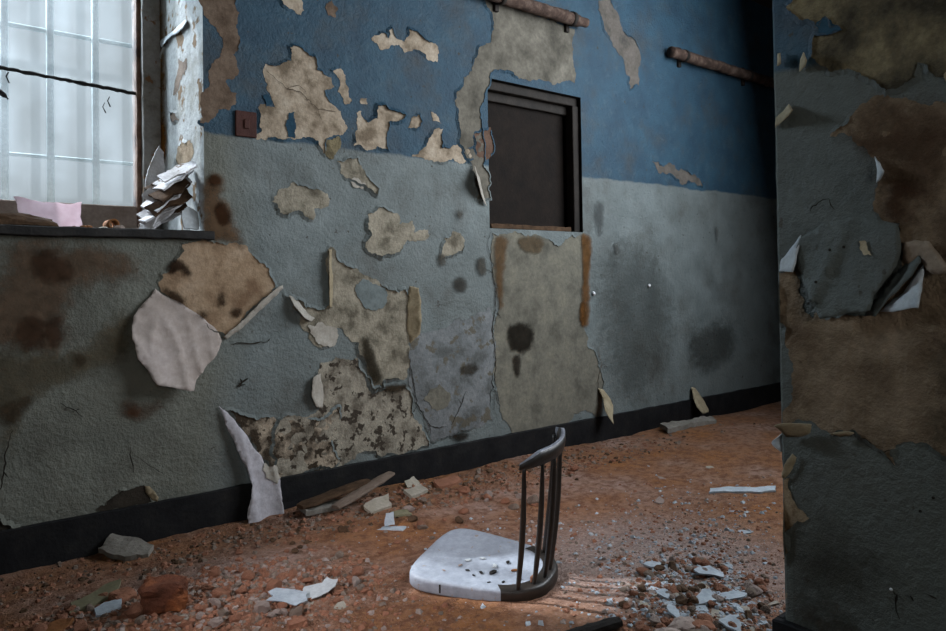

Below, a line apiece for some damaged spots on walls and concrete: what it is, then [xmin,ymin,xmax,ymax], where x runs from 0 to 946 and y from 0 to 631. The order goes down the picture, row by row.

flaking render [197,0,243,126]
flaking render [256,0,576,261]
damp [0,240,137,423]
damp [164,289,185,304]
damp [169,260,191,275]
damp [219,293,241,317]
flaking render [132,239,430,523]
flaking render [772,0,946,565]
crack [0,431,12,490]